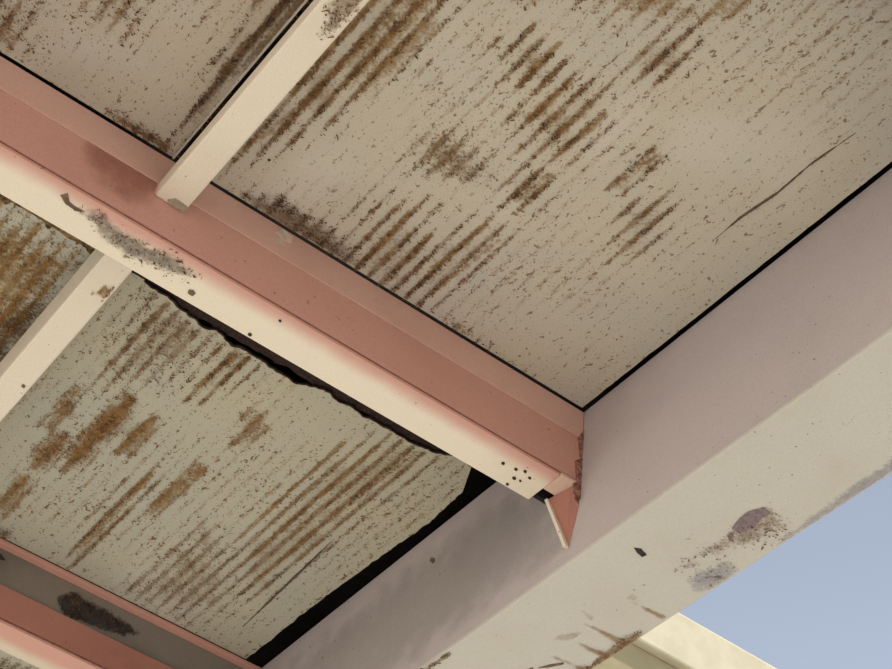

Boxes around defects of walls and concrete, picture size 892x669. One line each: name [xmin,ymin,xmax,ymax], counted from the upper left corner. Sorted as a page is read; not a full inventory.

rust [0,0,58,72]
rust [67,0,153,50]
rust [104,0,309,158]
rust [226,0,470,184]
rust [571,0,757,86]
rust [240,23,620,365]
rust [603,145,682,262]
crack [716,133,855,238]
rust [0,194,95,360]
rust [58,459,211,570]
rust [110,427,448,626]
rust [58,592,136,637]